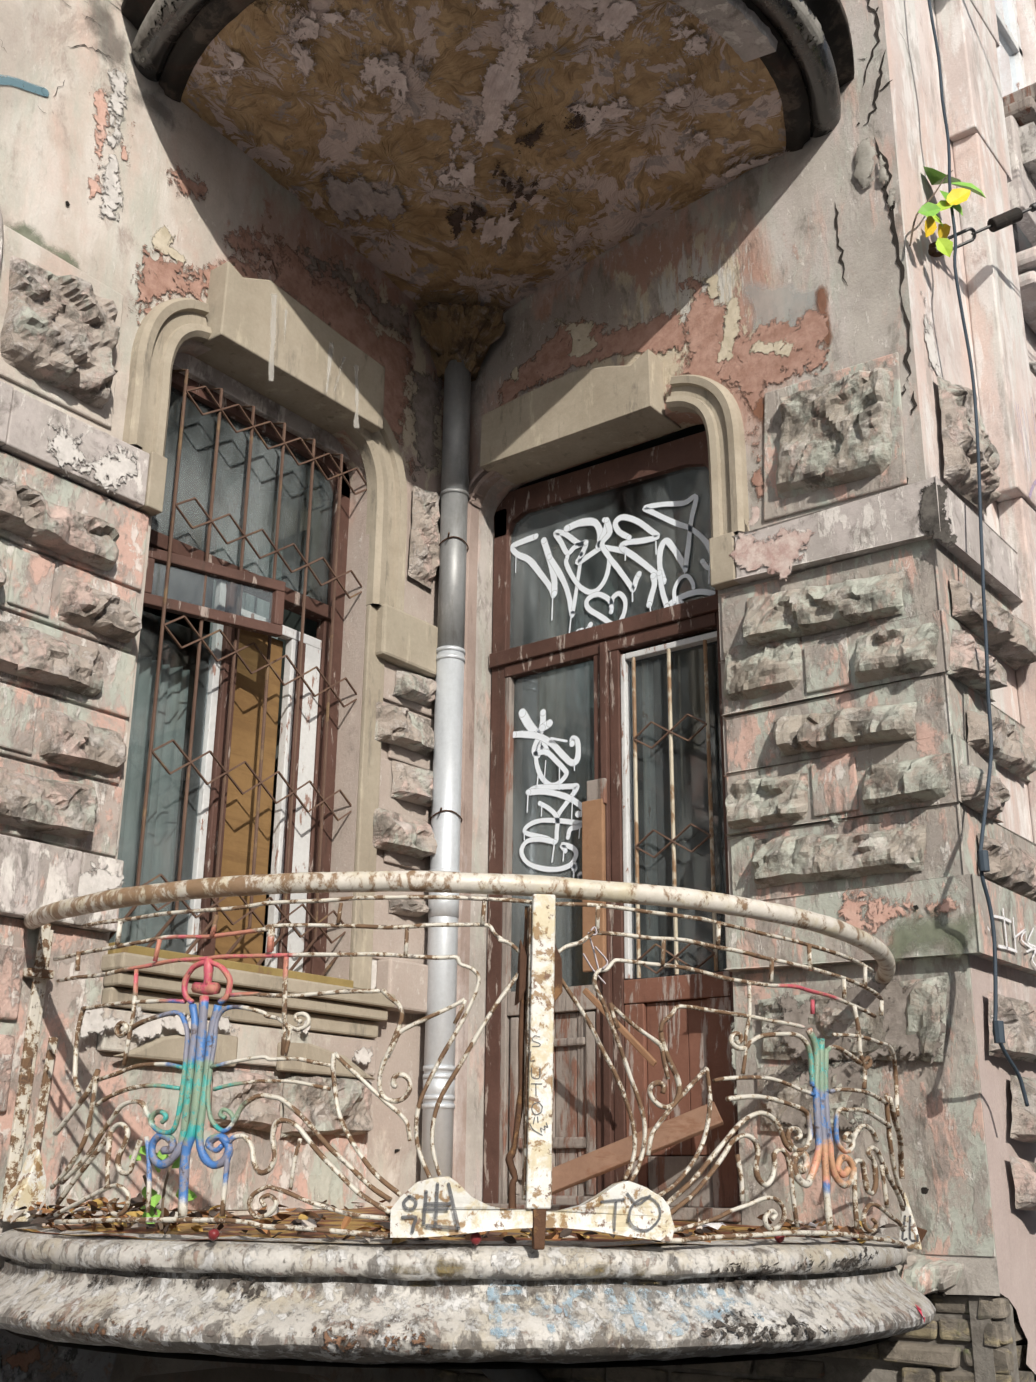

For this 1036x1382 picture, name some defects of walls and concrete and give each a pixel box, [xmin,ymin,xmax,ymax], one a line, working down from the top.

peeling [131,0,185,52]
peeling [251,0,433,120]
peeling [88,68,135,222]
peeling [436,0,712,254]
crack [834,204,848,286]
crack [857,0,926,415]
peeling [497,266,830,581]
peeling [835,888,967,935]
peeling [704,1247,878,1291]
spalling [895,1250,964,1295]
spalling [311,1320,433,1356]
peeling [696,1307,838,1350]